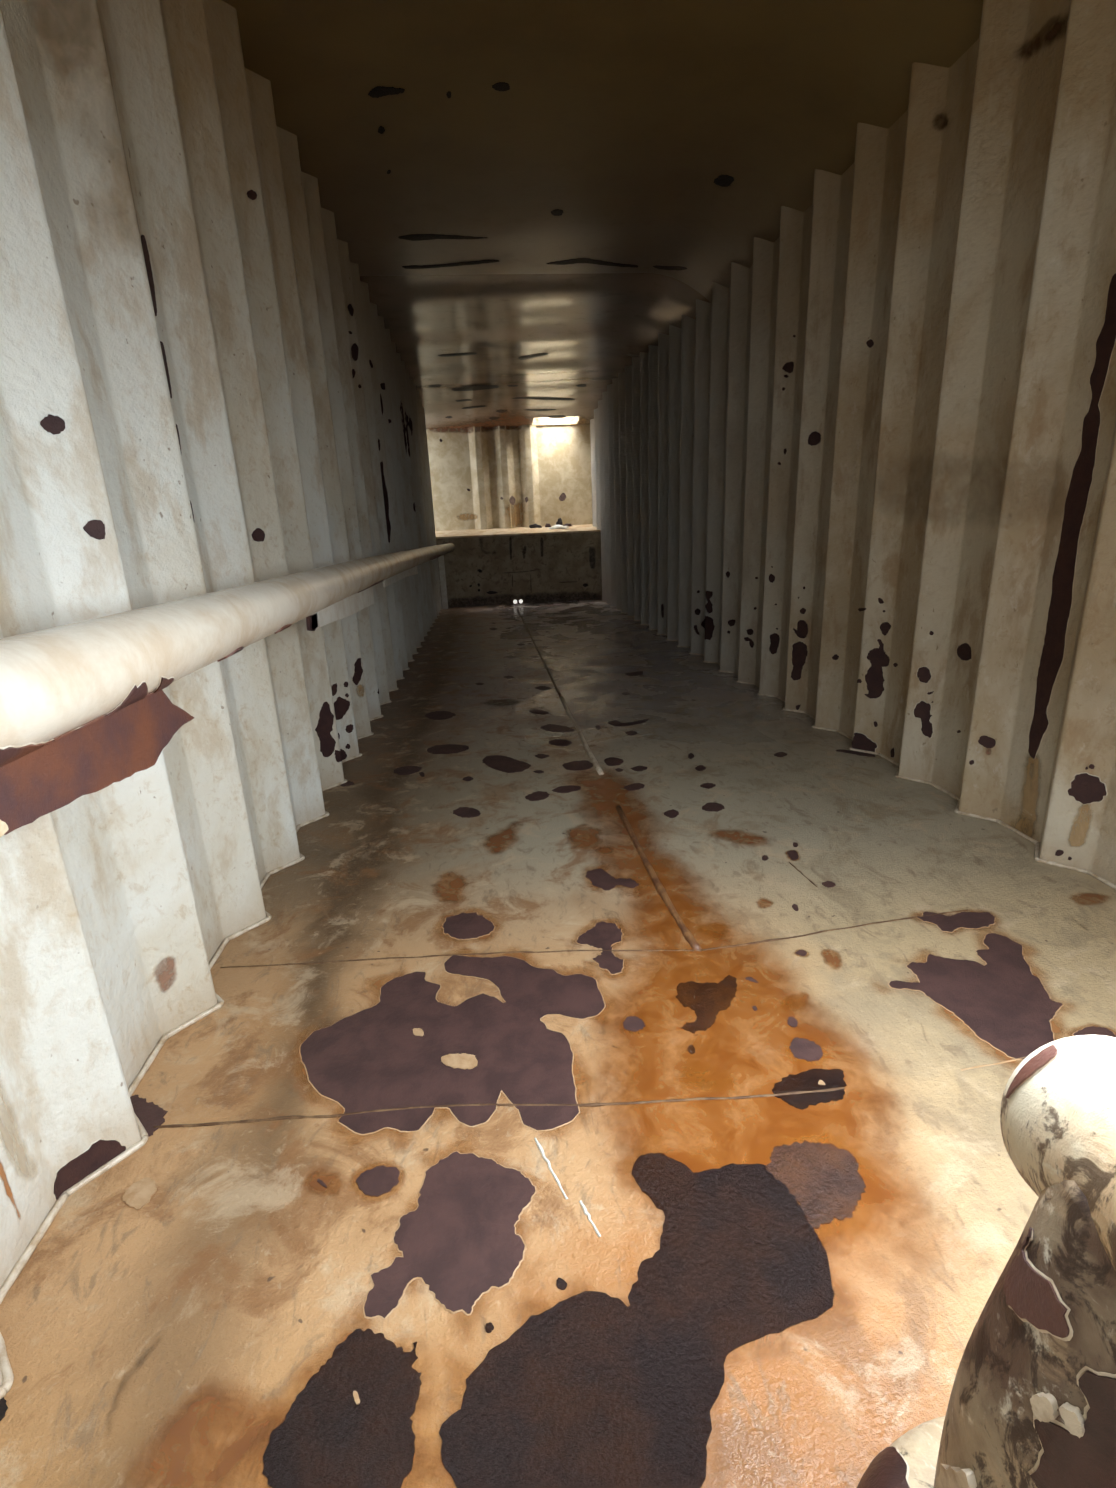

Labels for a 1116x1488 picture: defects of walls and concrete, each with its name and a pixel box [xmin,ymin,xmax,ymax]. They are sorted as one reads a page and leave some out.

corrosion [1015,273,1116,837]
corrosion [694,586,808,681]
corrosion [314,658,379,763]
corrosion [1055,764,1108,860]
corrosion [888,911,1116,1099]
corrosion [136,683,916,1488]
corrosion [0,1162,20,1217]
corrosion [1004,1226,1073,1341]
corrosion [936,1463,977,1488]
corrosion [1028,1366,1116,1488]